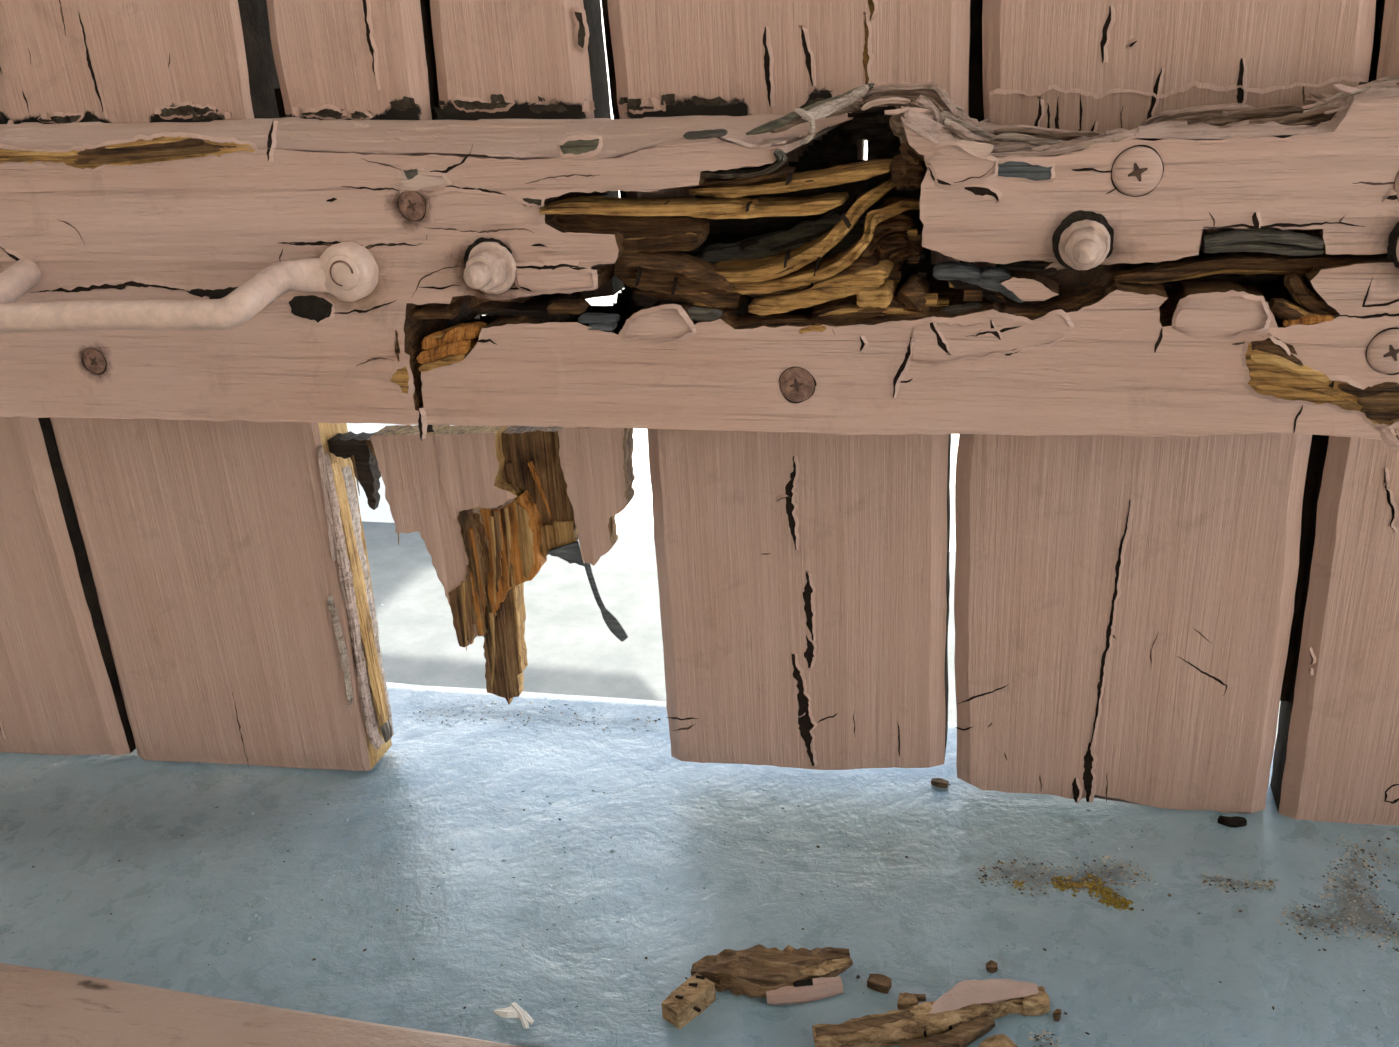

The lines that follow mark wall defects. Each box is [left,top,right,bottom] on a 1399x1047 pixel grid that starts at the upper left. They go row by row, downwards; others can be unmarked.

peeling [746,74,1399,191]
crack [0,247,191,301]
peeling [515,267,598,296]
peeling [619,304,697,342]
peeling [909,309,1076,366]
peeling [1172,290,1399,452]
peeling [318,446,660,750]
crack [762,456,855,766]
crack [1039,500,1135,803]
crack [1150,628,1227,696]
crack [666,717,699,731]
crack [955,684,1009,761]